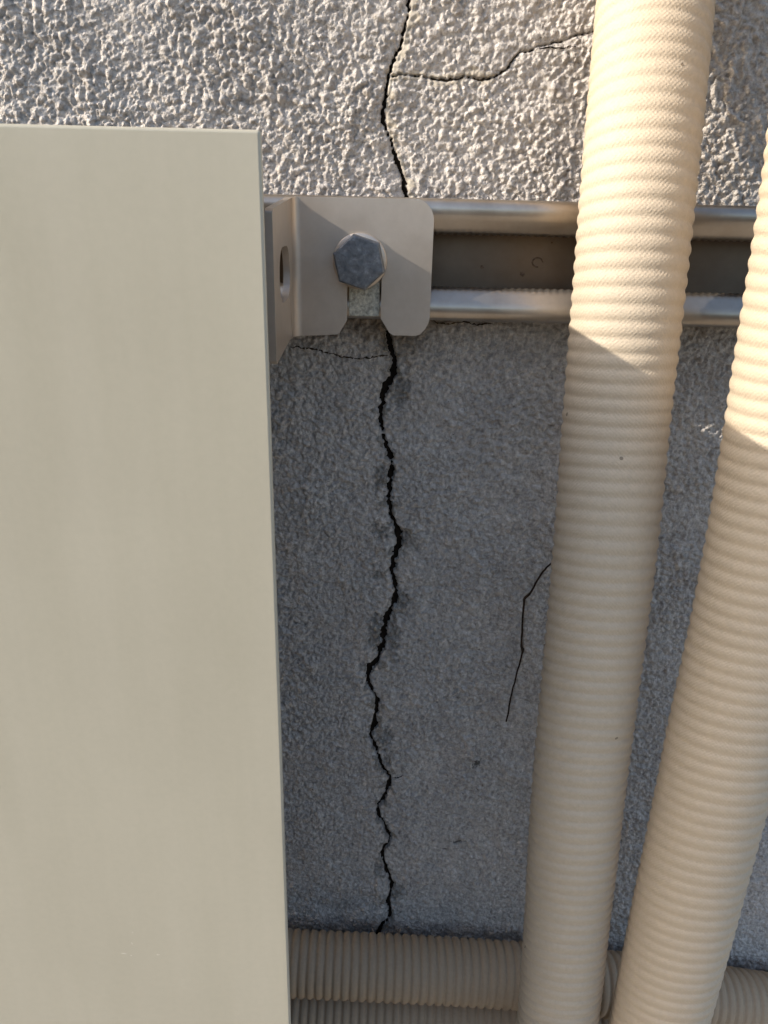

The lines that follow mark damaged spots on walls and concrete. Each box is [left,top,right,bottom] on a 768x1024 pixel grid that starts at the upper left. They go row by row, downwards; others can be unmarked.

crack [380,0,583,198]
crack [433,319,498,327]
crack [291,330,403,934]